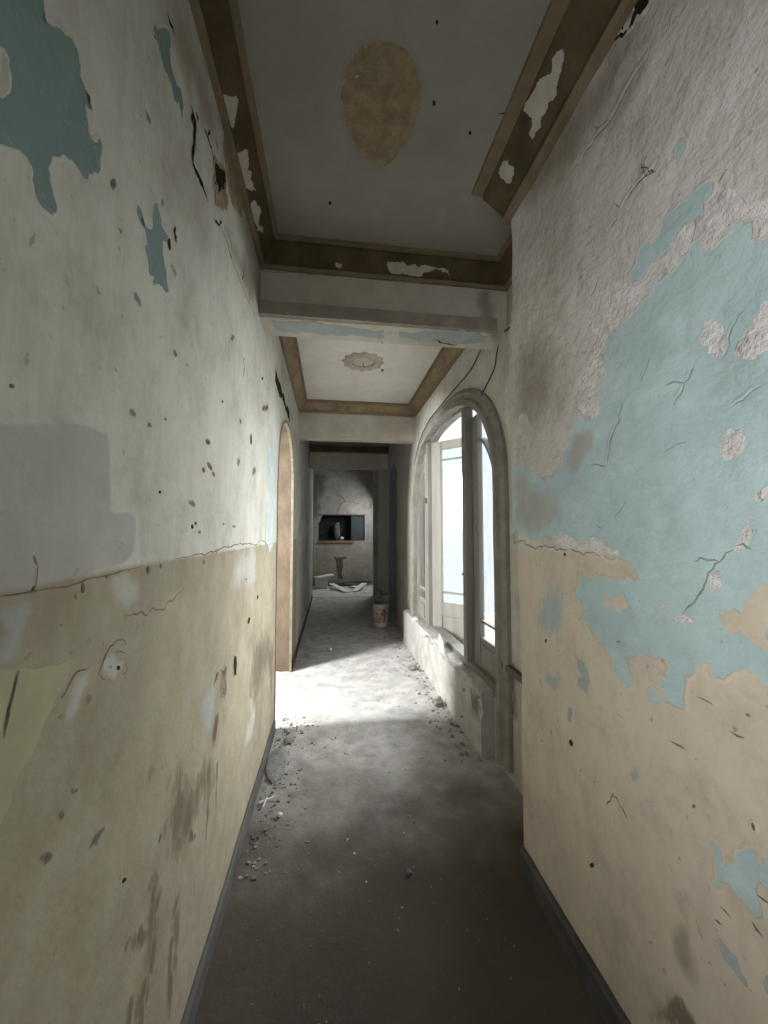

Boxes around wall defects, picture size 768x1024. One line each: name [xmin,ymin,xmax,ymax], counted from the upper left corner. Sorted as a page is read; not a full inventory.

peeling [0,0,116,222]
peeling [523,49,564,139]
peeling [134,198,177,296]
crack [182,97,254,314]
peeling [387,261,449,277]
crack [592,401,623,467]
peeling [527,175,768,715]
crack [0,564,139,596]
crack [177,540,268,559]
crack [683,543,752,613]
crack [607,793,628,822]
peeling [705,819,768,926]